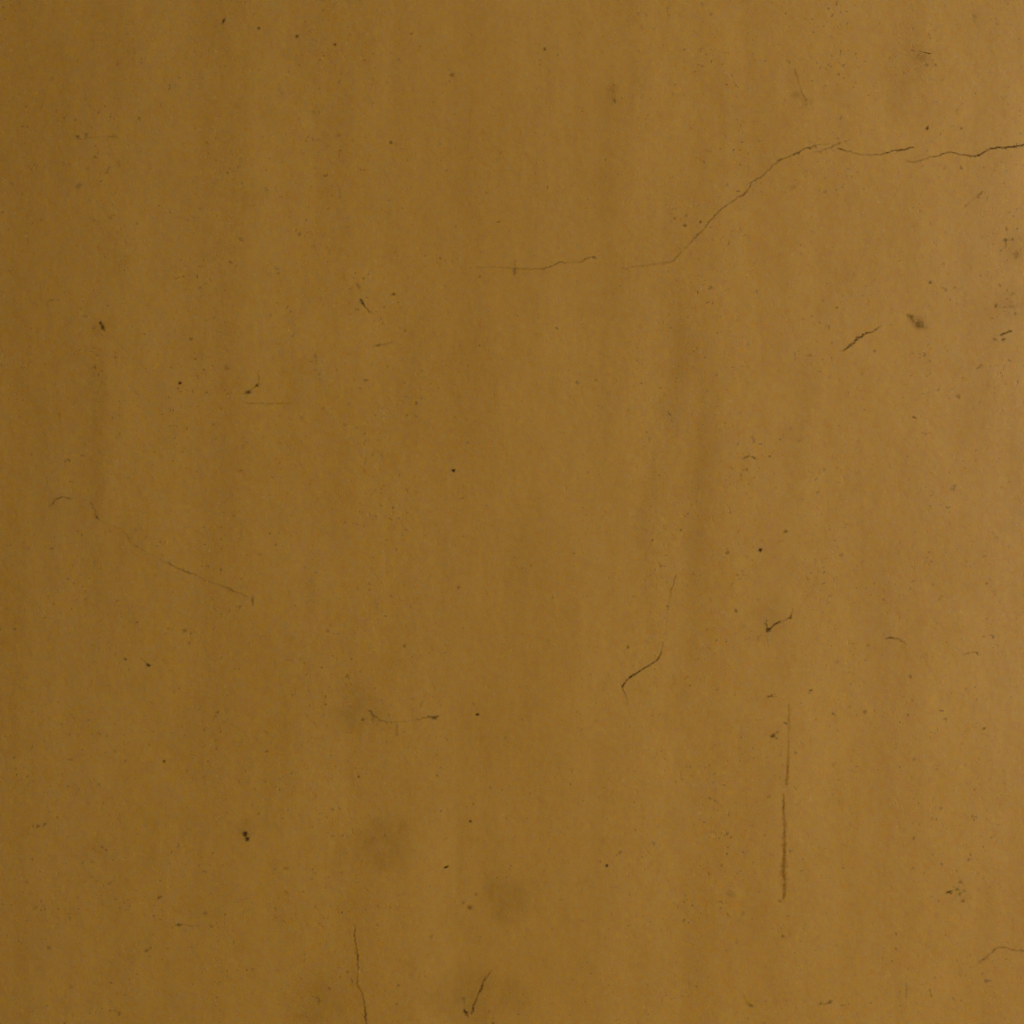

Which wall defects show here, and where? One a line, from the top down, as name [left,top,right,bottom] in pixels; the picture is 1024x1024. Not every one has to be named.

crack [620,138,1024,274]
crack [841,323,883,353]
crack [618,640,669,706]